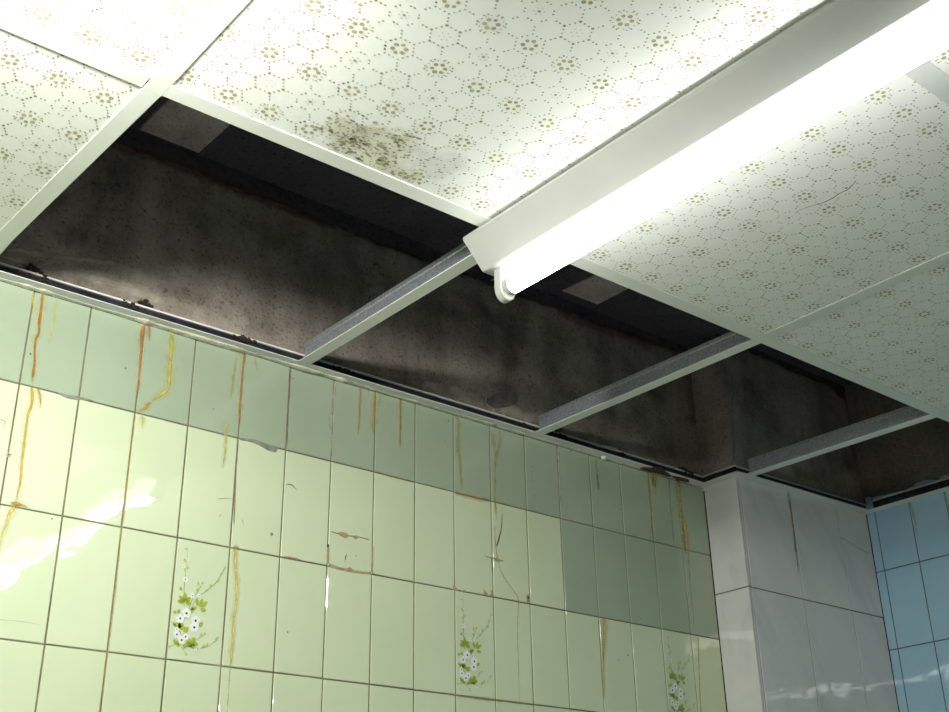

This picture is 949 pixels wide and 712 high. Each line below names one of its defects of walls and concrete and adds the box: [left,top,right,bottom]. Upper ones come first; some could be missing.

leakage [315,109,443,185]
rust [32,295,43,376]
spalling [55,392,93,402]
rust [137,325,150,394]
rust [143,333,173,421]
spalling [487,392,518,408]
rust [0,388,41,541]
spalling [238,438,278,452]
spalling [597,444,689,483]